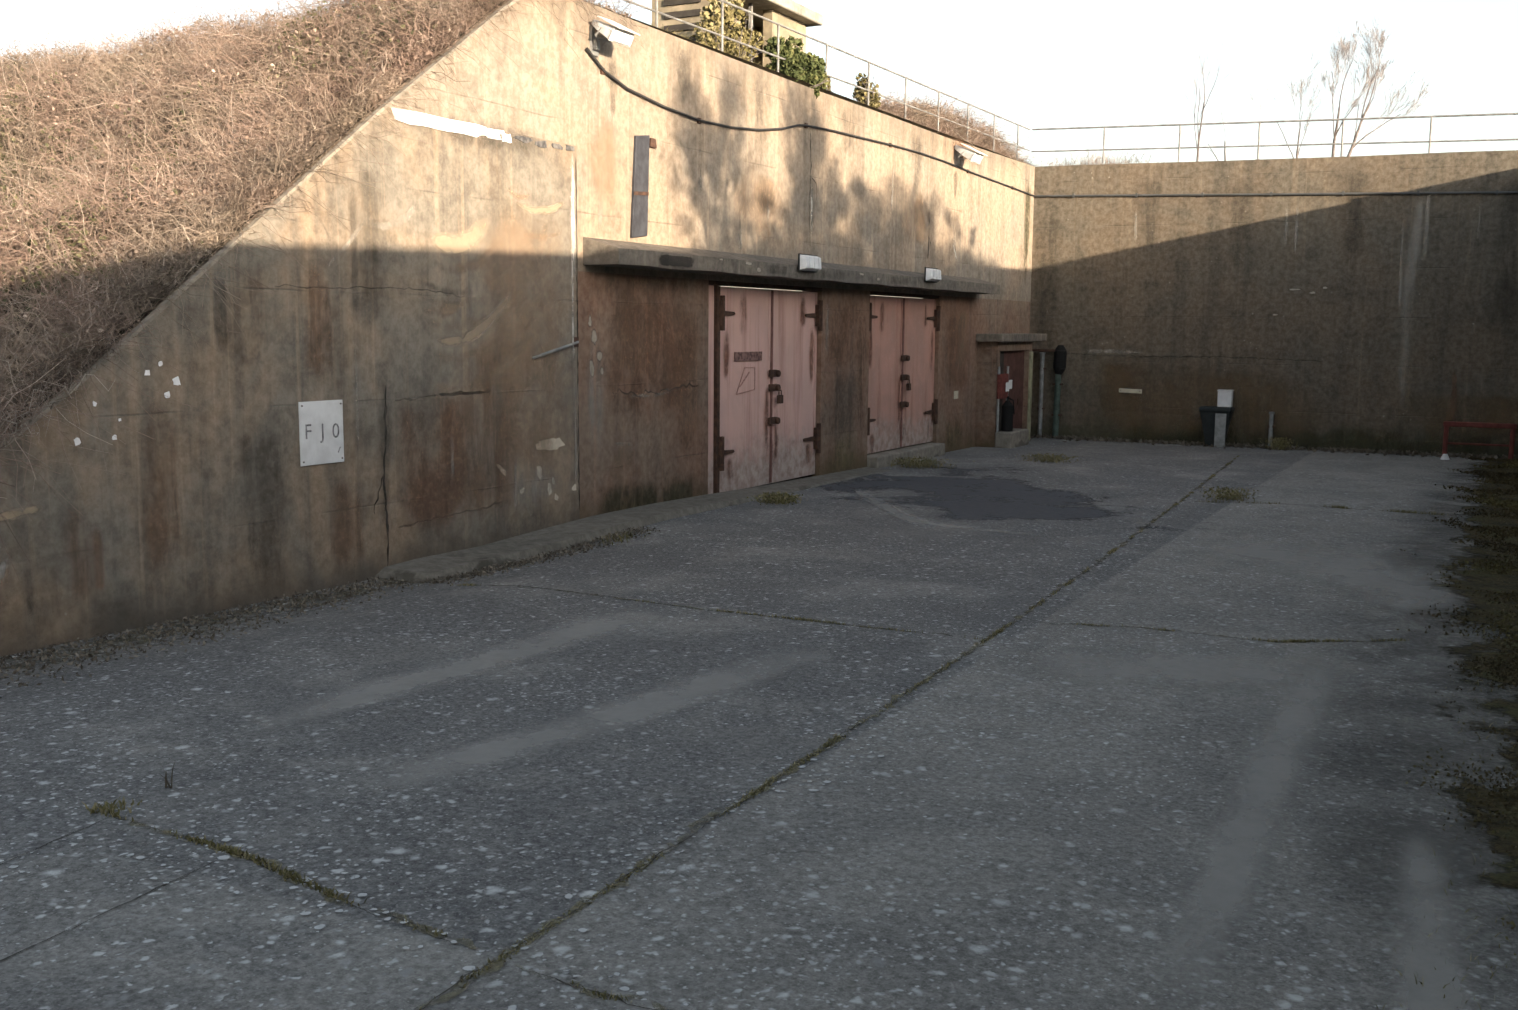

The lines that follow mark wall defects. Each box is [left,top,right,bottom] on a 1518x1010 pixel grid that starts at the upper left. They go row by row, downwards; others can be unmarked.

crack [0,456,1456,1010]